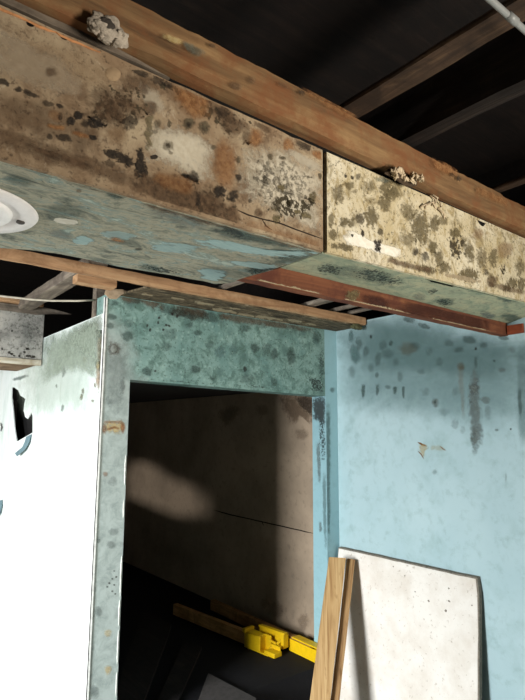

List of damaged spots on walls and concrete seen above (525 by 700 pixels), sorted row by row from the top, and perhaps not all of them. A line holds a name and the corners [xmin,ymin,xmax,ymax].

leakage [48,70,316,263]
leakage [333,174,360,203]
crack [238,210,322,239]
leakage [329,179,400,252]
peeling [153,239,318,269]
leakage [410,208,479,283]
peeling [197,269,226,281]
leakage [488,249,525,301]
leakage [410,289,493,329]
peeling [15,434,32,456]
corrosion [103,423,125,432]
leakage [470,377,482,443]